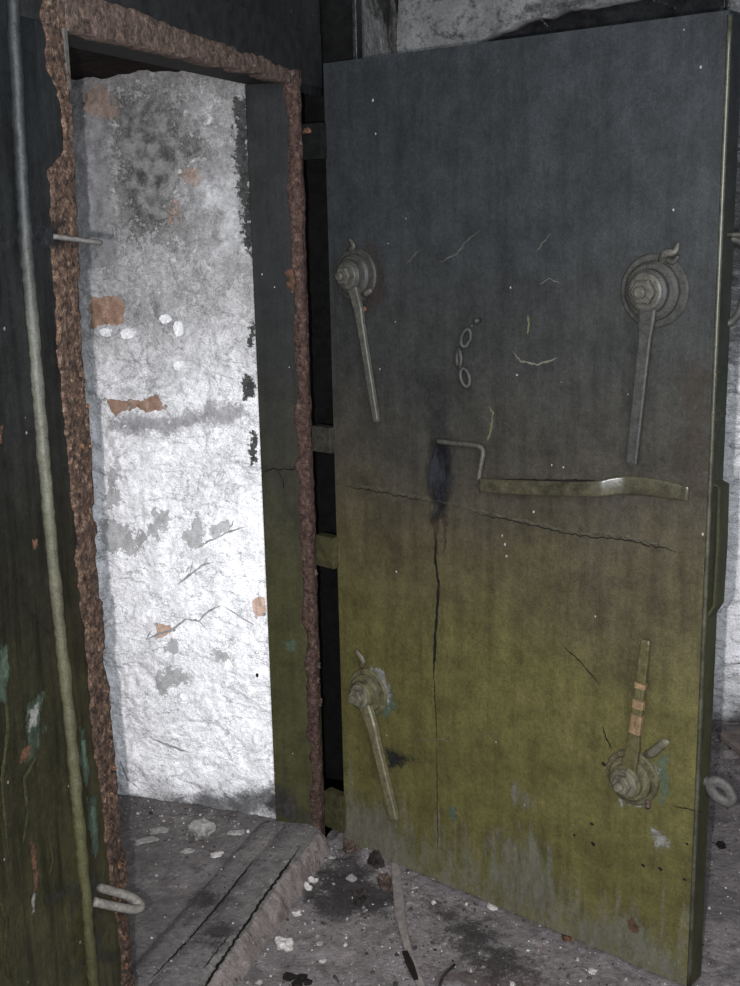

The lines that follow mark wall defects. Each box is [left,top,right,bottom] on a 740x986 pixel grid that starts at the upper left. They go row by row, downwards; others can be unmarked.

spalling [87,294,136,339]
spalling [103,394,168,417]
crack [343,483,691,553]
crack [432,536,440,848]